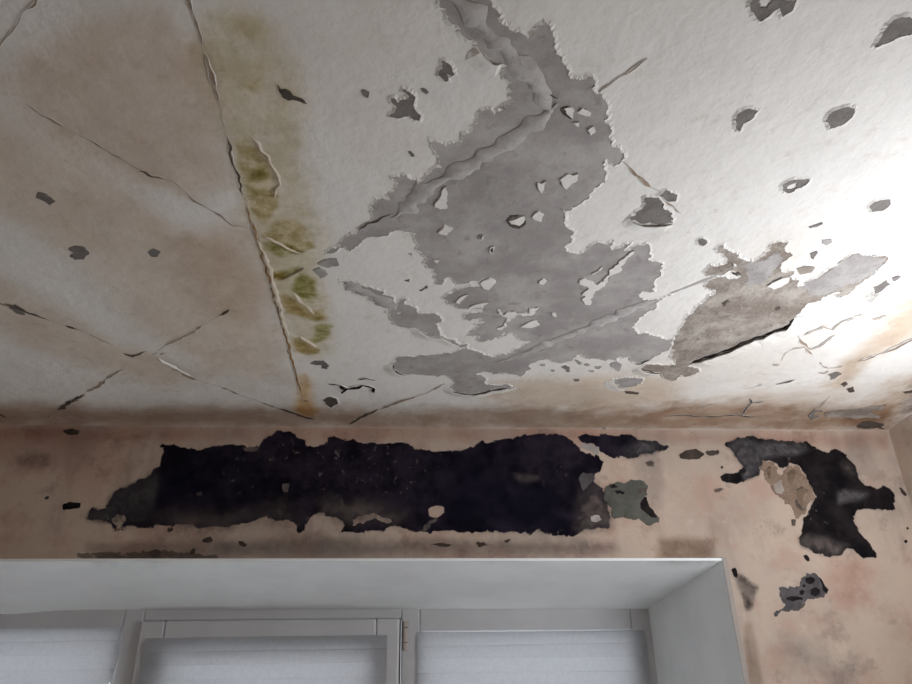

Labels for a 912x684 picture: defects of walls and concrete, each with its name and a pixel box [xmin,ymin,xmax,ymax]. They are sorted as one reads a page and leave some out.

peeling [870,12,912,50]
crack [0,0,314,420]
peeling [313,0,901,398]
crack [668,314,912,418]
crack [328,378,445,426]
flaking render [604,479,660,526]
flaking render [760,460,815,526]
flaking render [774,573,829,617]